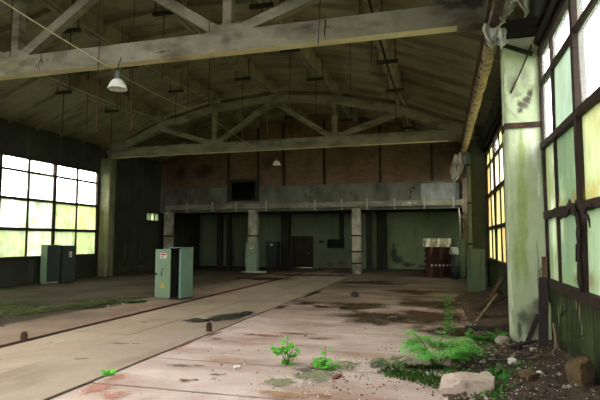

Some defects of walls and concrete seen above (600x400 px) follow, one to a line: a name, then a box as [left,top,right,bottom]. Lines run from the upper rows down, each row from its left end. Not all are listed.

water stain [182,311,252,322]